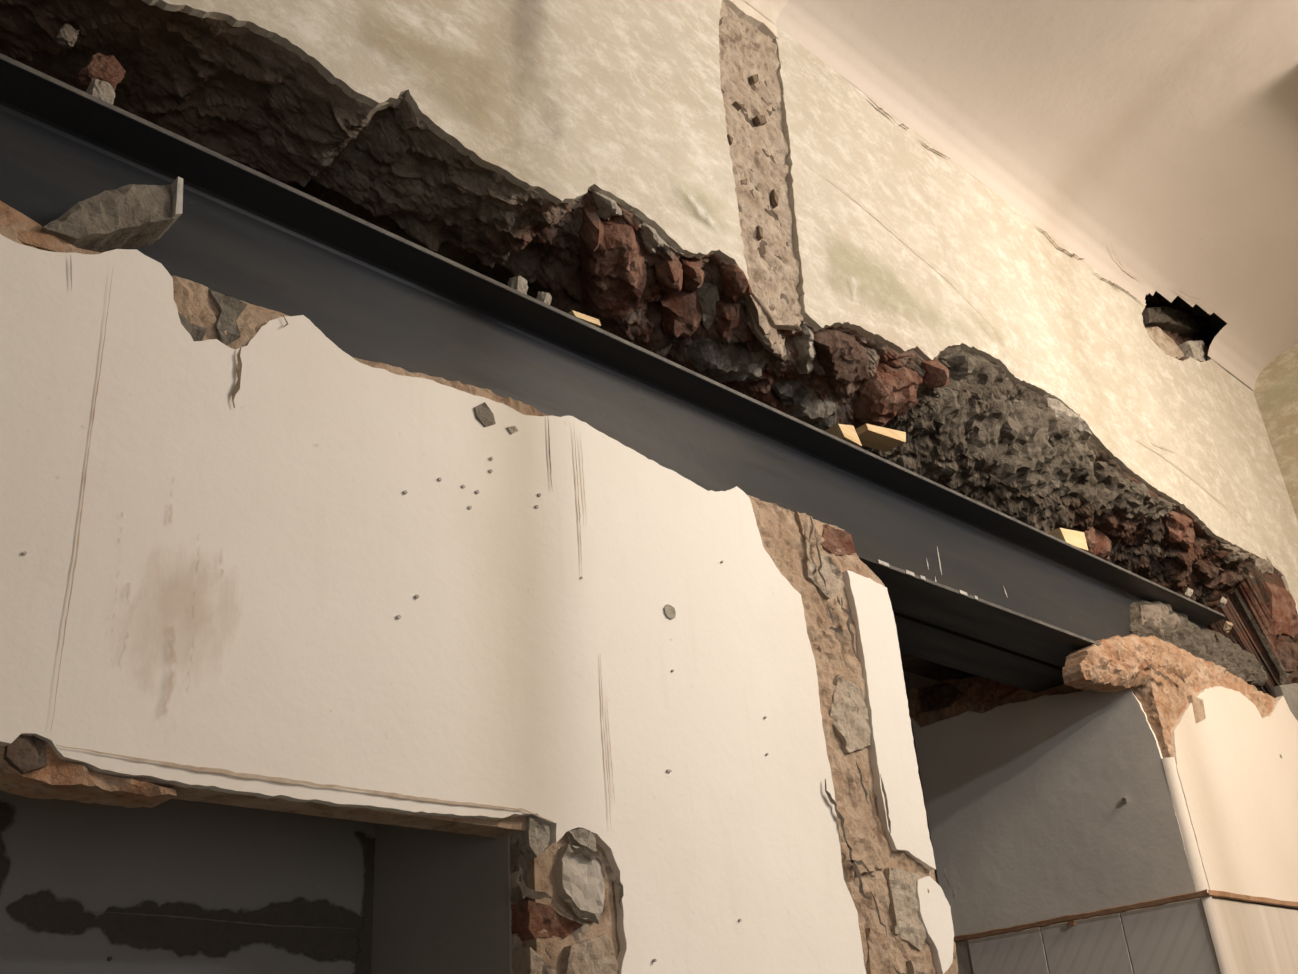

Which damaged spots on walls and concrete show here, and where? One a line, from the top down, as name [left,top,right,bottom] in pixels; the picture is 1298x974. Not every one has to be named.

spalling [0,0,1298,762]
spalling [0,735,177,808]
spalling [510,817,624,974]
spalling [747,495,958,974]